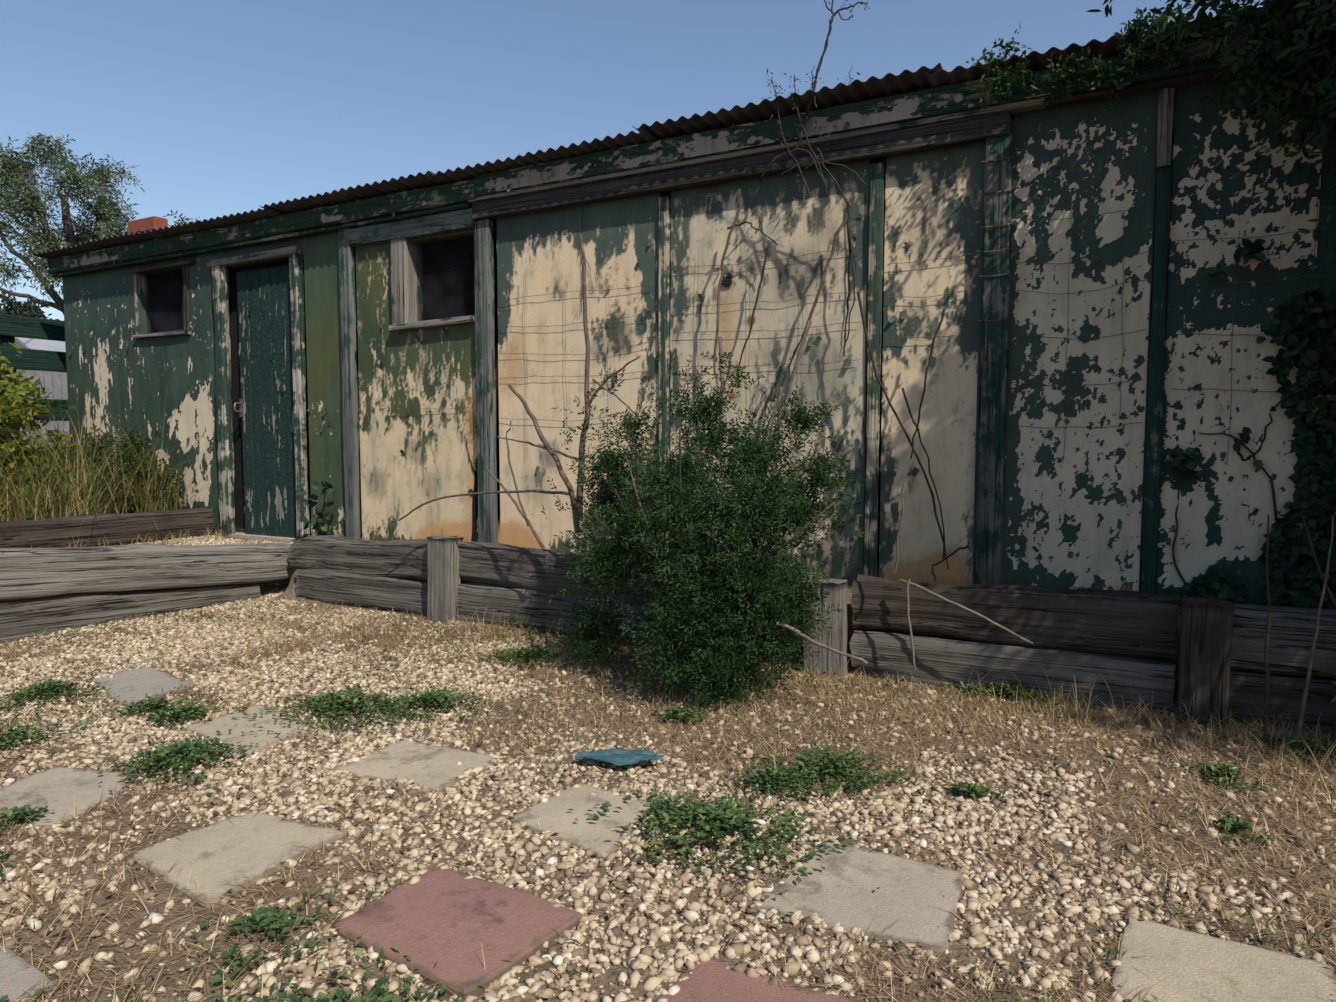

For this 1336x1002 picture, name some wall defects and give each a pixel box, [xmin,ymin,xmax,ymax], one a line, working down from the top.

peeling [484,123,775,192]
peeling [798,93,1005,138]
peeling [69,259,215,508]
peeling [244,486,287,528]
peeling [239,288,338,466]
peeling [311,476,345,536]
peeling [358,315,479,542]
peeling [498,171,867,576]
corrosion [888,552,966,584]
peeling [879,158,983,584]
peeling [1005,116,1152,591]
peeling [1158,108,1322,588]